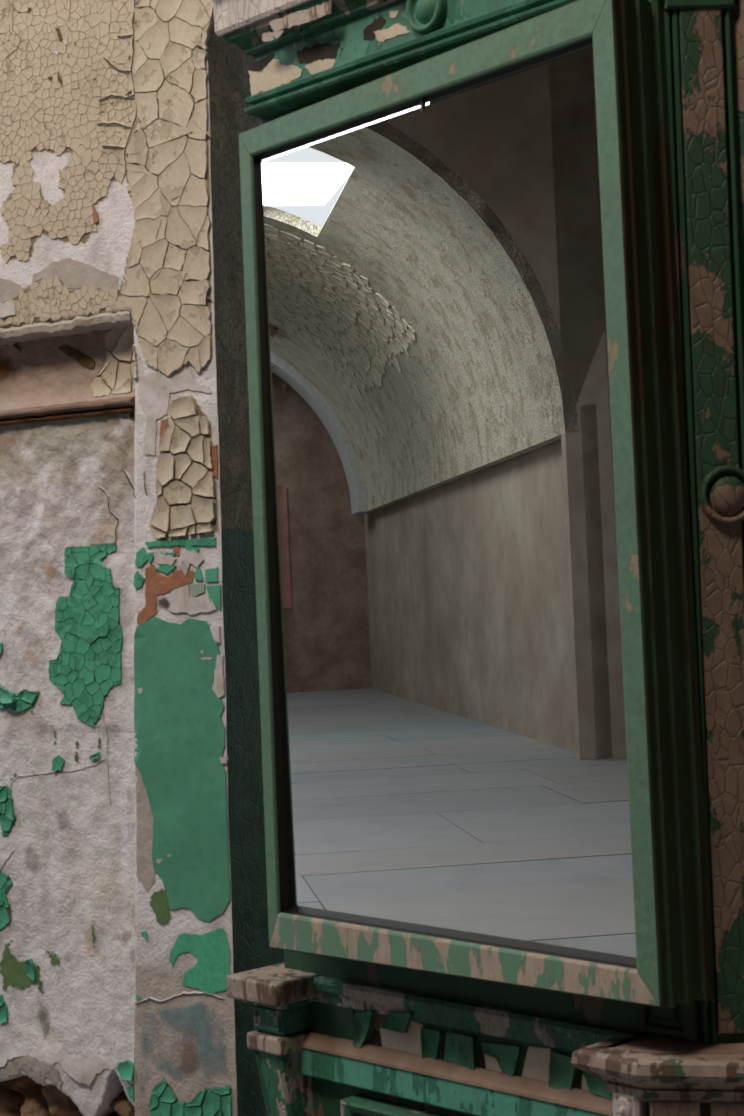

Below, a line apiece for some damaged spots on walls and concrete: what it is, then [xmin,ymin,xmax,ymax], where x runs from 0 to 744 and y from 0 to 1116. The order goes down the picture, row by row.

crack [0,0,26,69]
crack [97,0,212,323]
peeling [0,0,222,625]
peeling [48,544,123,726]
spalling [201,625,225,698]
peeling [0,686,40,712]
peeling [0,786,16,836]
spalling [135,767,171,892]
peeling [0,871,13,930]
peeling [169,928,230,994]
flaking render [0,1045,135,1116]
peeling [149,1080,232,1116]